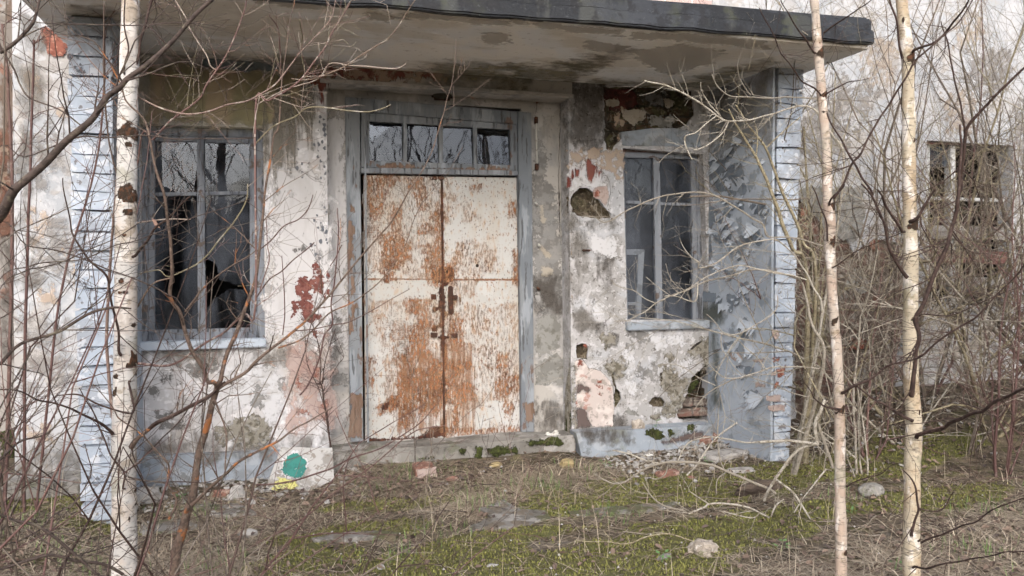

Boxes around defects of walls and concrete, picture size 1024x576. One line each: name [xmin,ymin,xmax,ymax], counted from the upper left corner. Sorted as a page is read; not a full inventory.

flaking render [41,25,85,87]
flaking render [603,87,694,151]
damp [681,60,773,88]
peeling [148,357,221,398]
peeling [277,203,363,439]
rust [364,174,447,283]
rust [366,298,520,442]
rust [455,249,518,286]
peeling [532,141,613,321]
flaking render [564,133,902,433]